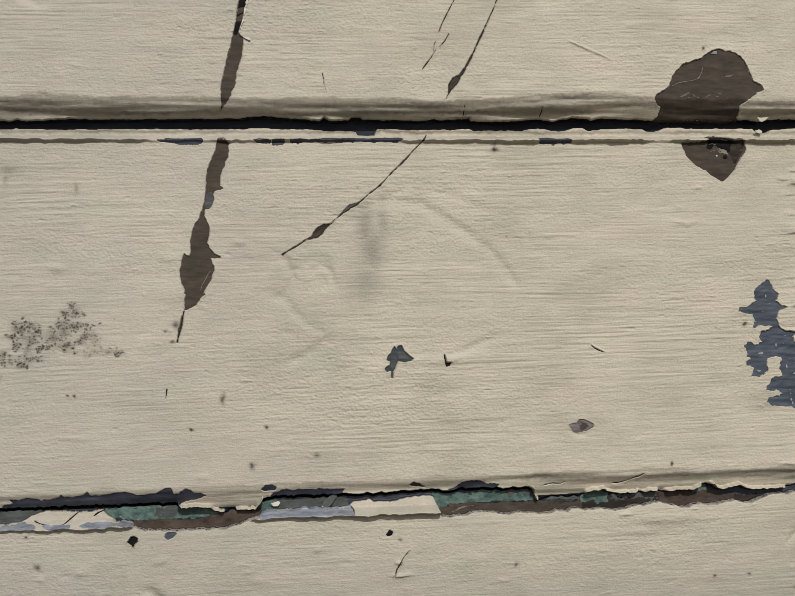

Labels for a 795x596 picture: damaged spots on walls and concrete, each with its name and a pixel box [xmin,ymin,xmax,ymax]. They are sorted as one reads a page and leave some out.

crack [422,0,454,70]
crack [446,0,497,99]
peeling [649,49,764,125]
peeling [681,136,746,182]
crack [281,136,426,256]
peeling [385,346,413,378]
peeling [739,280,795,408]
peeling [569,419,594,432]
spalling [0,480,795,548]